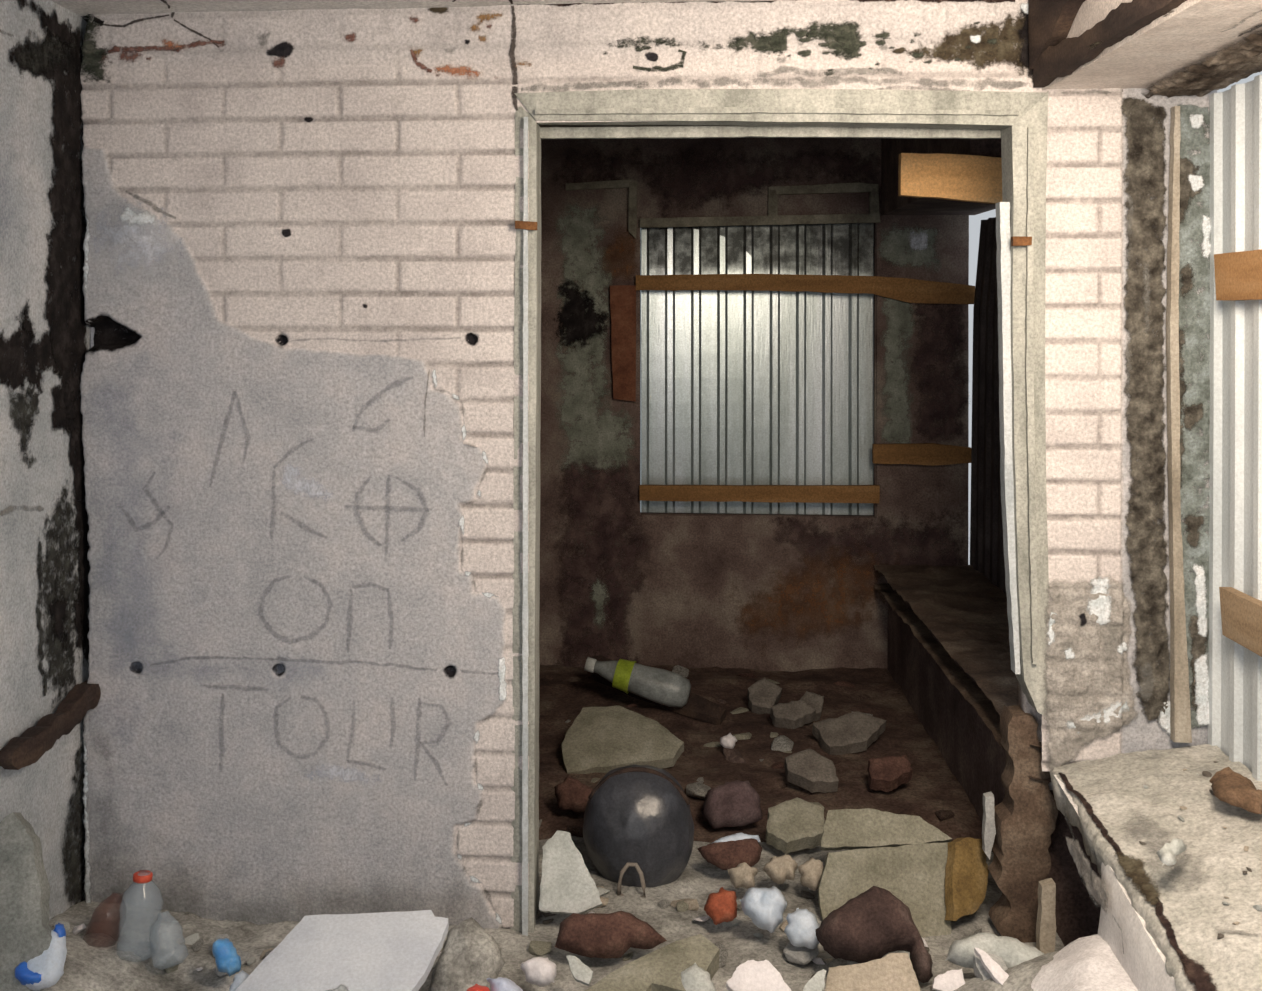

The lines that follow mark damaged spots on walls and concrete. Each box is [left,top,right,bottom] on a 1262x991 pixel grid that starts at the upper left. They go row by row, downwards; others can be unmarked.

rust [102,39,224,63]
rust [410,49,480,77]
rust [465,13,502,44]
damp [604,36,687,72]
crack [509,0,797,111]
damp [700,3,1033,90]
crack [858,0,1015,8]
spalling [85,315,141,352]
spalling [1044,24,1262,770]
damp [36,541,84,696]
spalling [457,657,516,928]
crack [1058,772,1217,991]